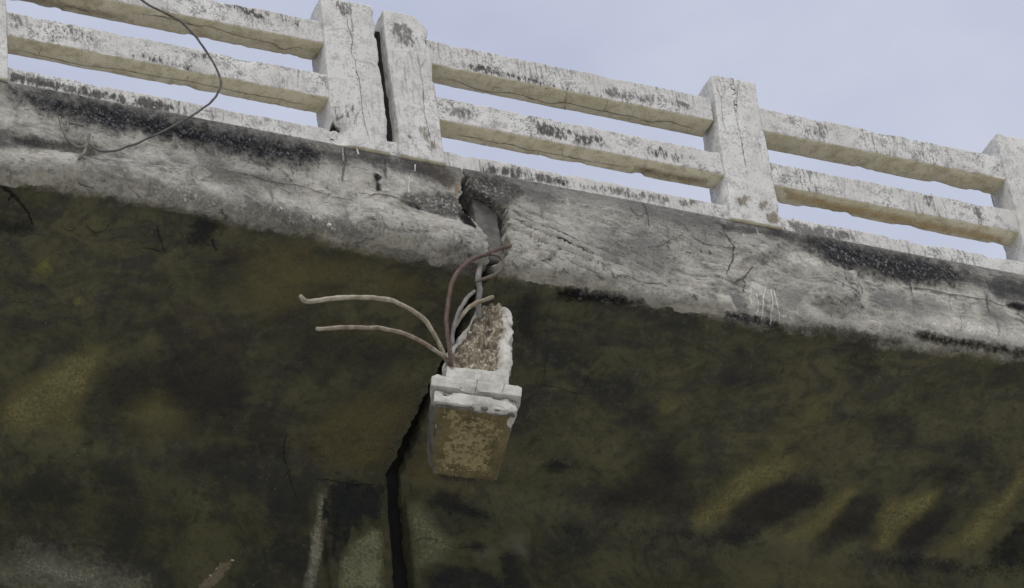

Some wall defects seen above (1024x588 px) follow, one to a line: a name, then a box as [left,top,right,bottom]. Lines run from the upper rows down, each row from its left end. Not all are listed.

crack [328,14,370,133]
leakage [0,137,55,149]
leakage [715,221,828,270]
leakage [756,287,901,346]
leakage [852,248,1024,345]
leakage [0,349,101,433]
peeling [434,407,508,476]
leakage [307,481,383,588]
leakage [689,455,821,545]
leakage [785,470,1024,576]